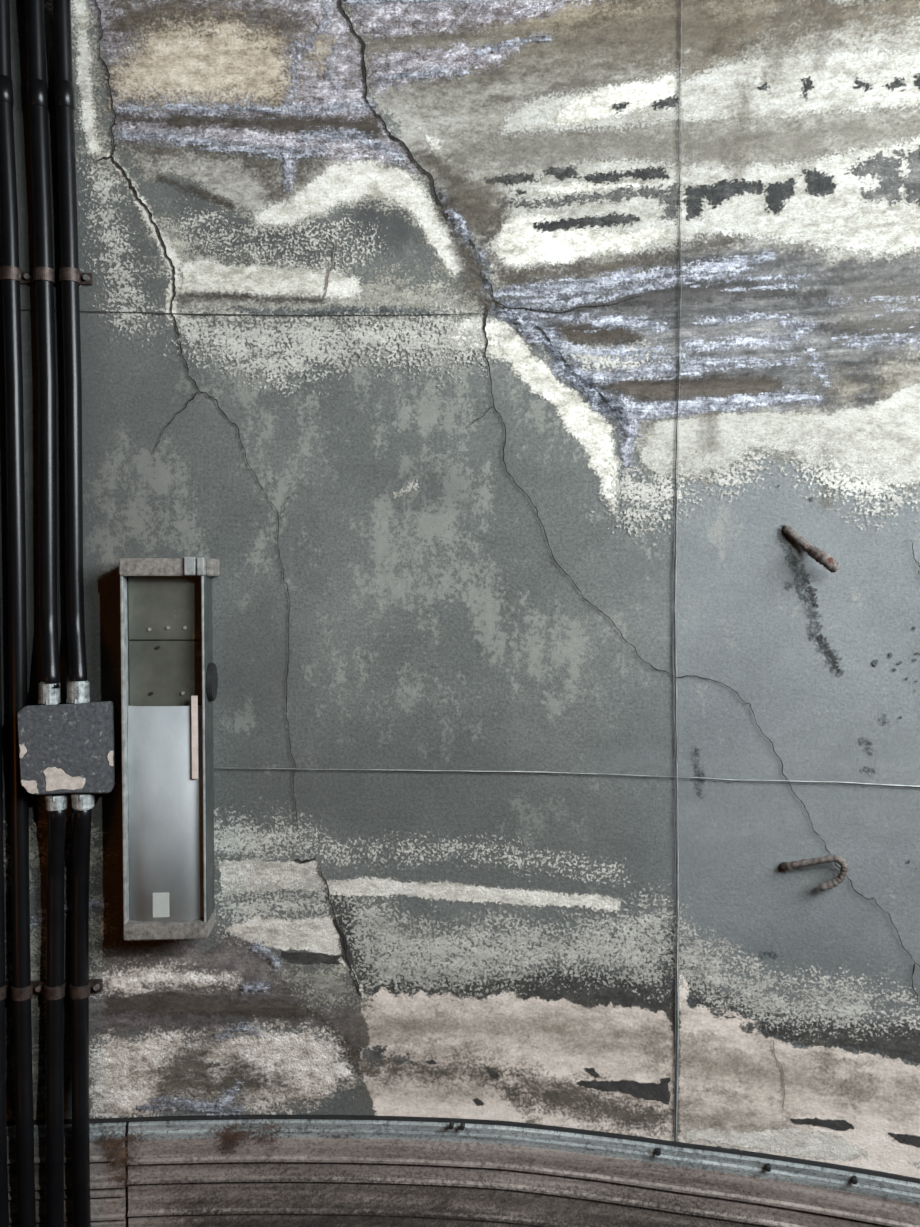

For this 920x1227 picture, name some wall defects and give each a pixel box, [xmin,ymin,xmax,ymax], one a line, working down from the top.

crack [95,0,298,830]
crack [322,239,337,304]
damp [71,0,920,546]
crack [339,0,920,1006]
damp [30,908,46,1120]
damp [29,799,48,892]
crack [295,858,362,997]
damp [89,797,920,1118]